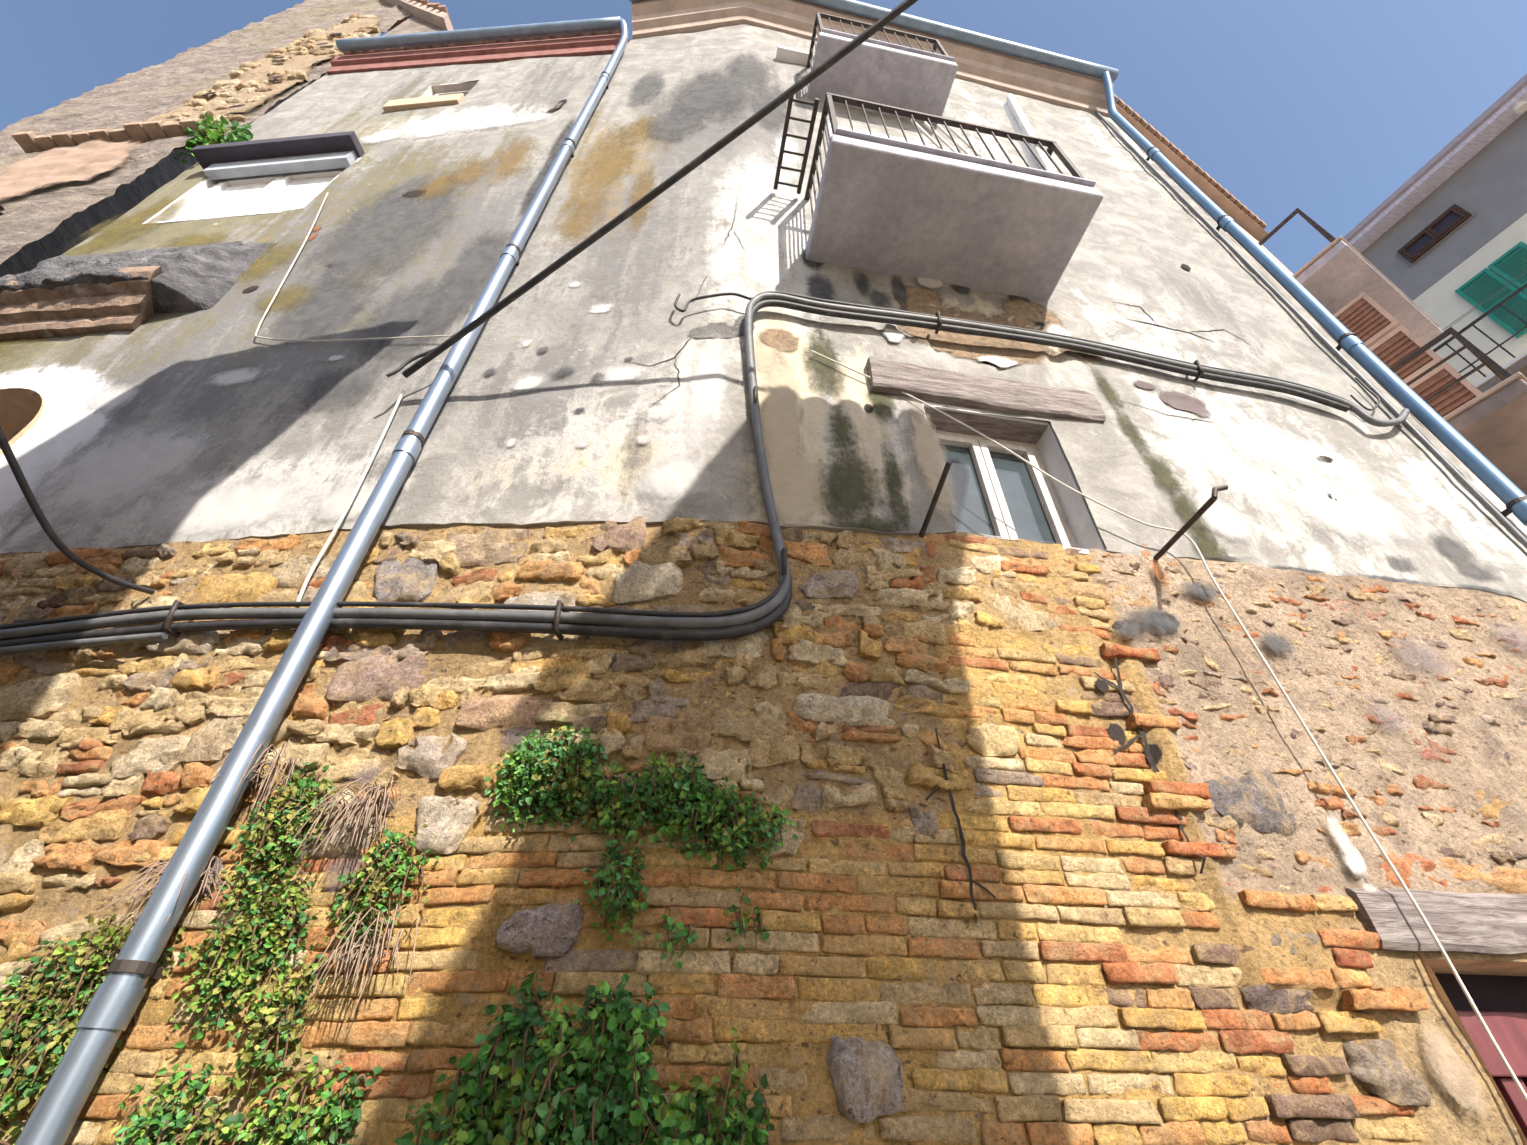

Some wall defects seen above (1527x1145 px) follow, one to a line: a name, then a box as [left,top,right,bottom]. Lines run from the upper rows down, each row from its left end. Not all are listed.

spalling [143,14,381,125]
leakage [521,120,575,211]
leakage [257,180,516,410]
crack [631,197,746,403]
spalling [883,277,1104,367]
crack [1117,302,1249,344]
leakage [88,387,138,413]
leakage [211,369,259,386]
leakage [511,375,544,391]
leakage [599,366,646,383]
leakage [34,422,375,536]
leakage [821,450,909,531]